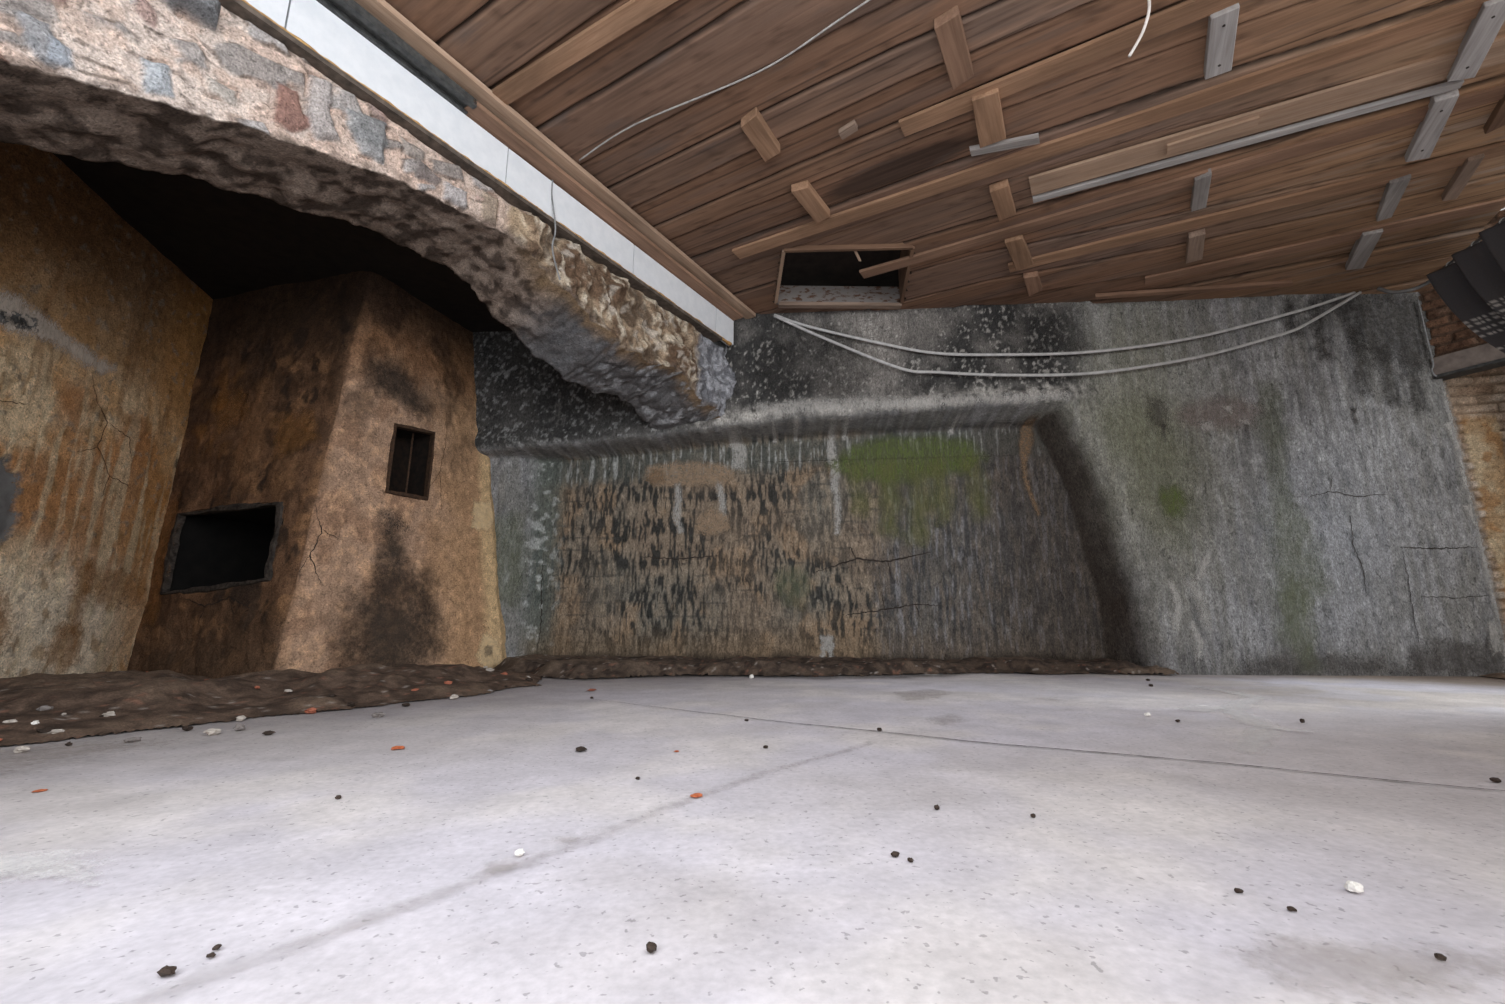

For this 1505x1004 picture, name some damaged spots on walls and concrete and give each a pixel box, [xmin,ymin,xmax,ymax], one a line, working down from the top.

leakage [1281,298,1431,412]
flaking render [0,455,23,544]
leakage [757,391,1071,544]
leakage [378,529,430,614]